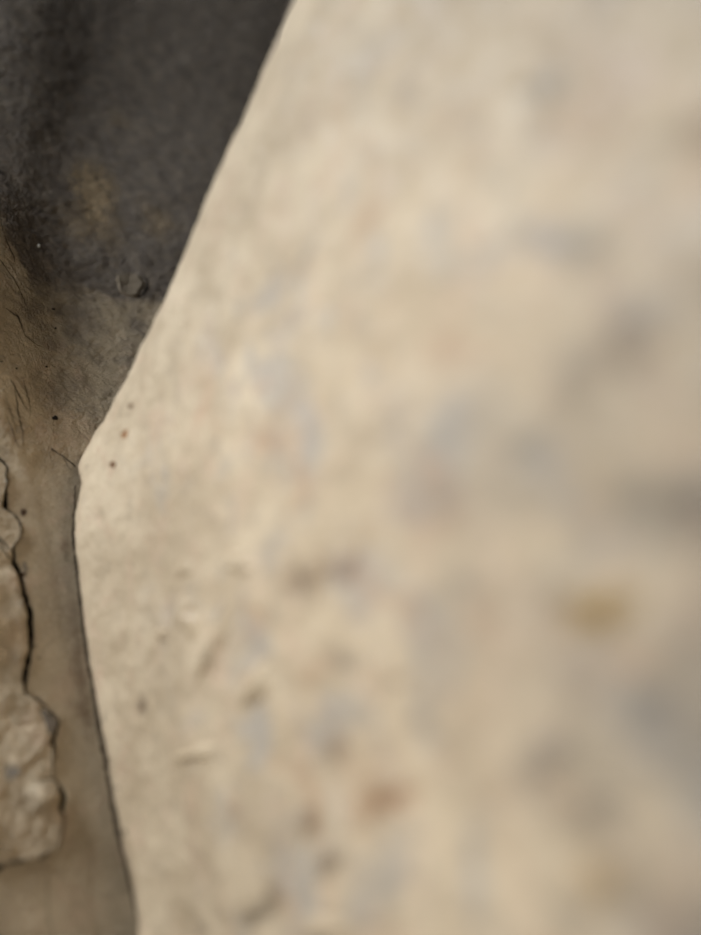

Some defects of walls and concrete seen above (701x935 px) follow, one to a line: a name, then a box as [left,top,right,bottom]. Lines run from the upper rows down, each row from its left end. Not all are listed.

crack [0,236,45,349]
crack [51,448,75,469]
crack [0,379,66,869]